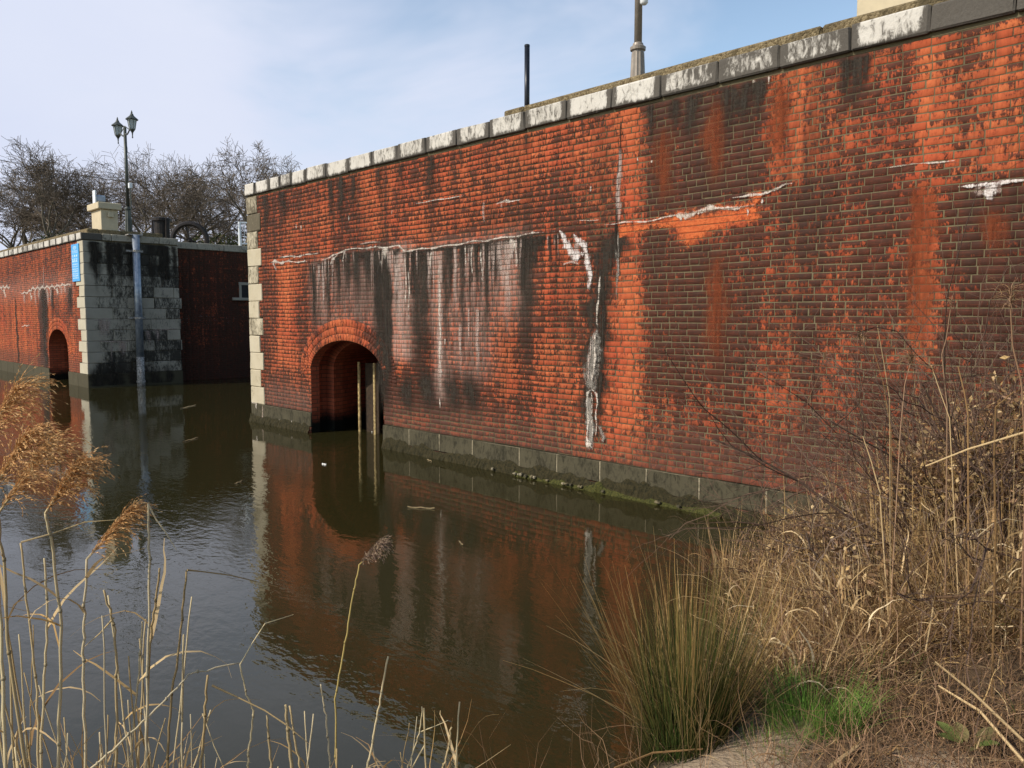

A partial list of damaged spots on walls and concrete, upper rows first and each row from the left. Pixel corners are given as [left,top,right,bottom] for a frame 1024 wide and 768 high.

water stain [89,242,133,285]
water stain [148,245,177,279]
water stain [310,230,630,436]